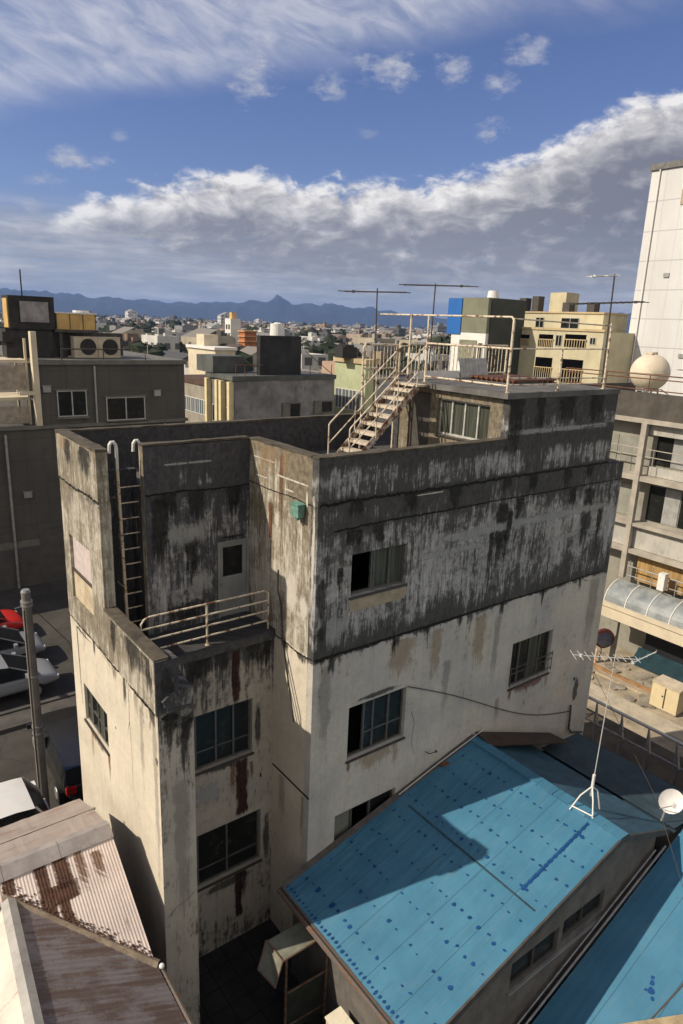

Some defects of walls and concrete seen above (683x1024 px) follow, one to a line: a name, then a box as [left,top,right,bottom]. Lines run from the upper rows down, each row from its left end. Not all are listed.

leakage [504,395,606,455]
leakage [63,438,90,481]
crack [145,461,620,544]
leakage [151,501,214,620]
leakage [423,488,604,580]
leakage [316,568,348,646]
rust [232,651,240,701]
leakage [164,713,191,773]
rust [231,757,253,815]
rust [1,875,16,897]
rust [33,850,104,925]